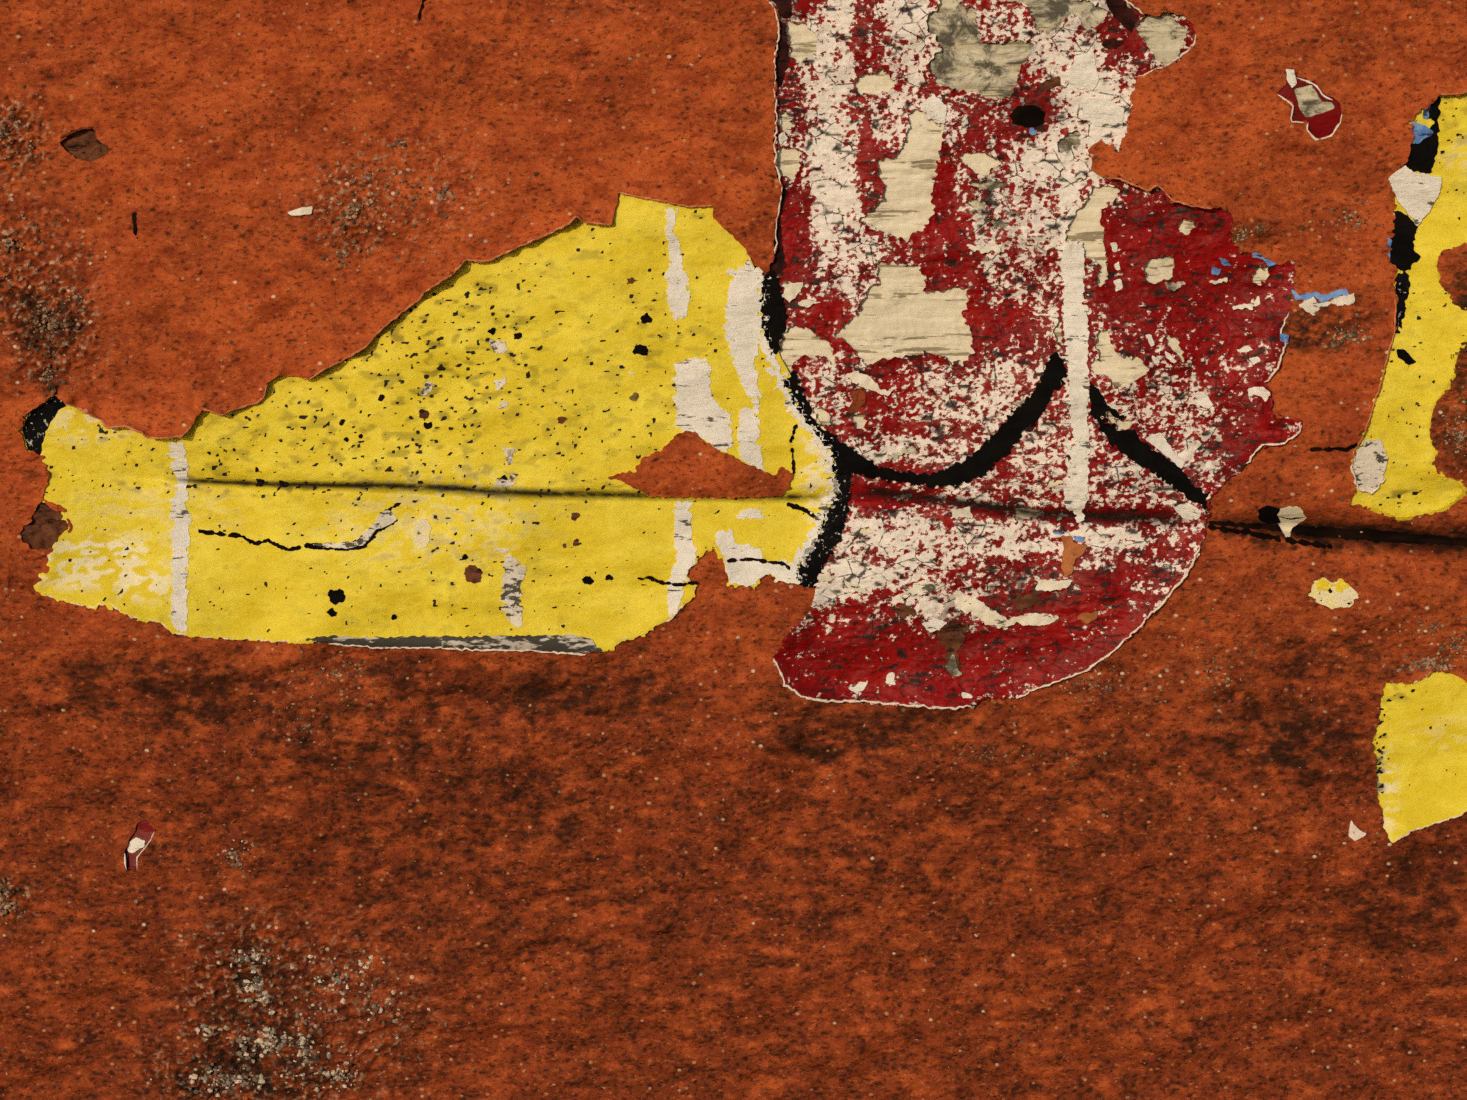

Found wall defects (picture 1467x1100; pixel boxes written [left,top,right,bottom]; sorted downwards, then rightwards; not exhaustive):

peeling [19,0,1358,711]
peeling [1350,90,1467,522]
crack [1208,520,1467,549]
peeling [124,820,156,870]
peeling [1348,820,1366,841]
peeling [1371,671,1467,843]